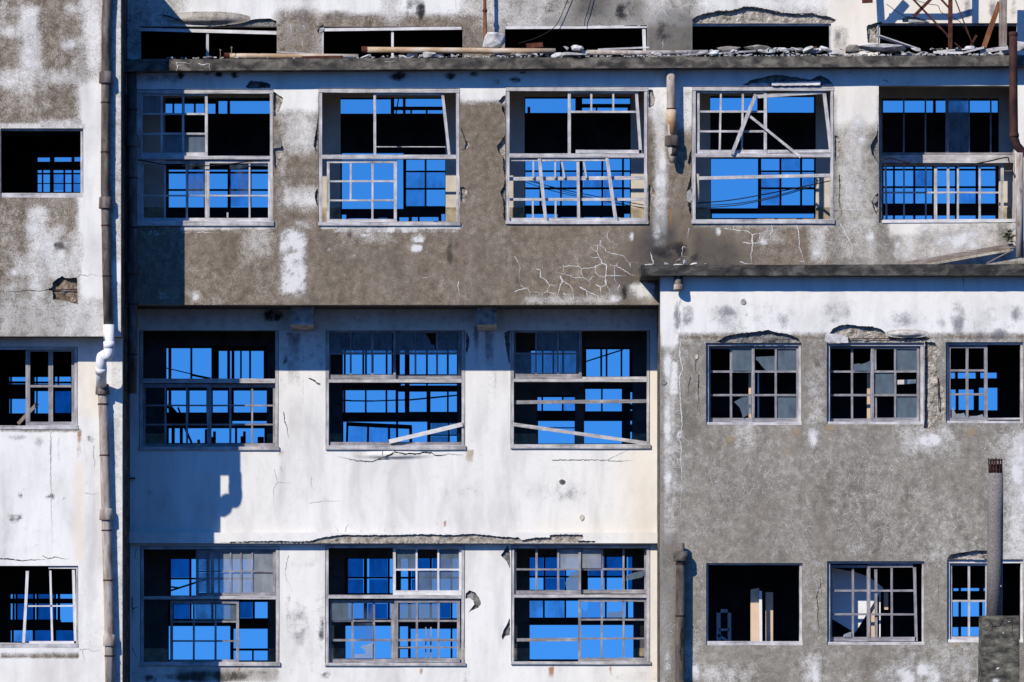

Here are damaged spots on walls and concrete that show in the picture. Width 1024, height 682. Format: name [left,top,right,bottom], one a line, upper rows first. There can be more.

spalling [692,7,835,23]
spalling [743,75,833,86]
crack [725,175,869,264]
leakage [26,217,69,283]
crack [514,233,654,302]
spalling [48,276,78,304]
spalling [717,330,801,343]
spalling [825,324,946,430]
crack [346,450,460,462]
spalling [221,534,595,568]
spalling [465,590,481,611]